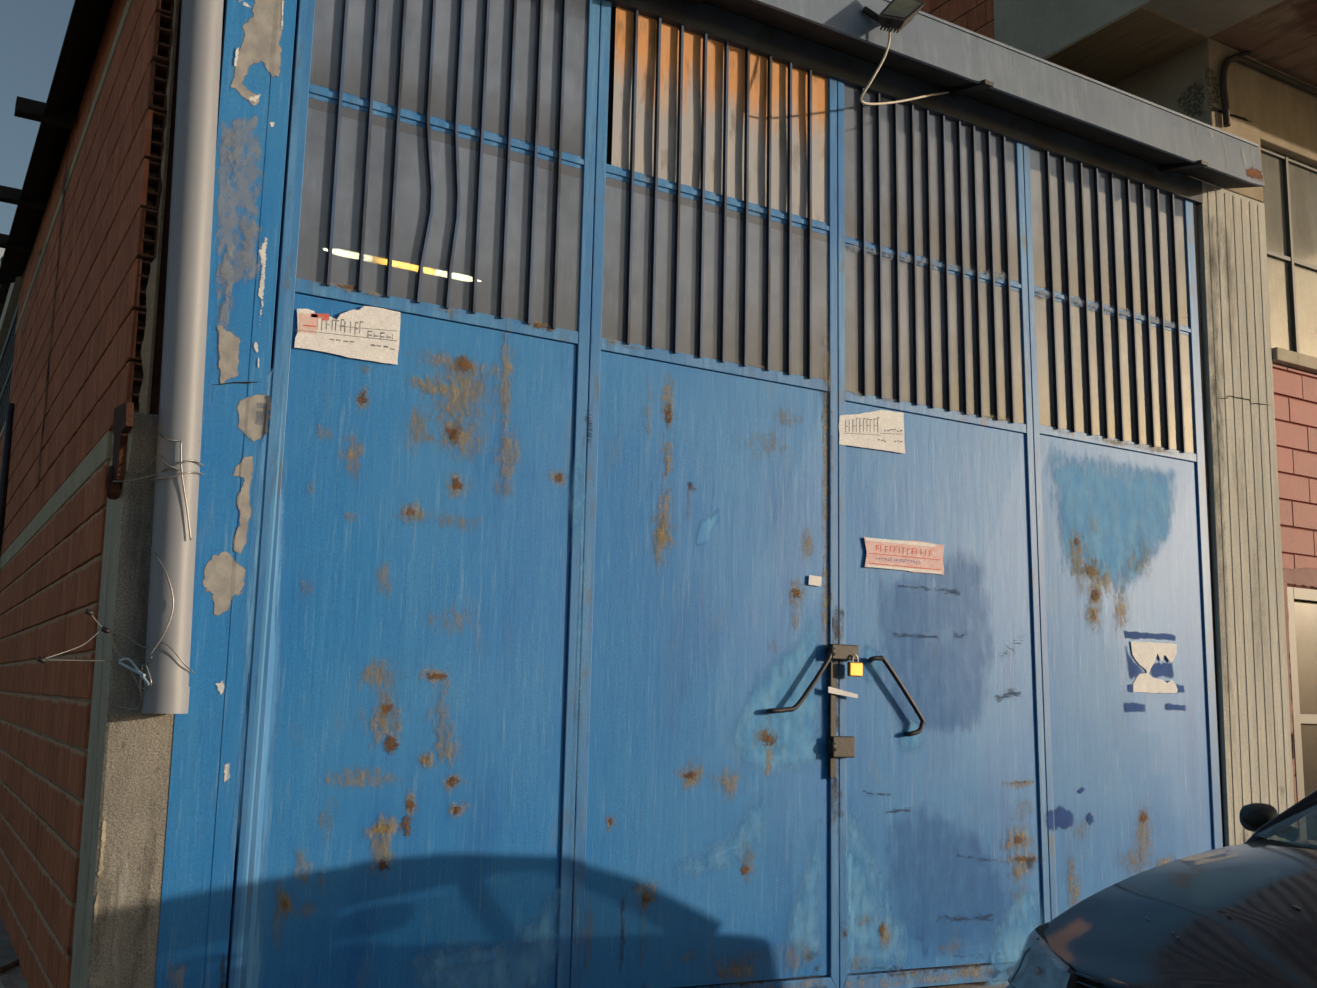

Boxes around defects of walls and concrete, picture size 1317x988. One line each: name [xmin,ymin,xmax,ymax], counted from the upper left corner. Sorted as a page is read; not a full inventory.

peeling [216,0,285,384]
crack [34,145,69,516]
corrosion [412,355,484,453]
corrosion [663,384,673,428]
crack [1210,396,1267,411]
peeling [203,394,271,615]
corrosion [804,386,833,554]
corrosion [1070,533,1126,624]
corrosion [371,699,401,755]
corrosion [758,729,777,773]
corrosion [370,796,416,869]
corrosion [1008,830,1036,877]